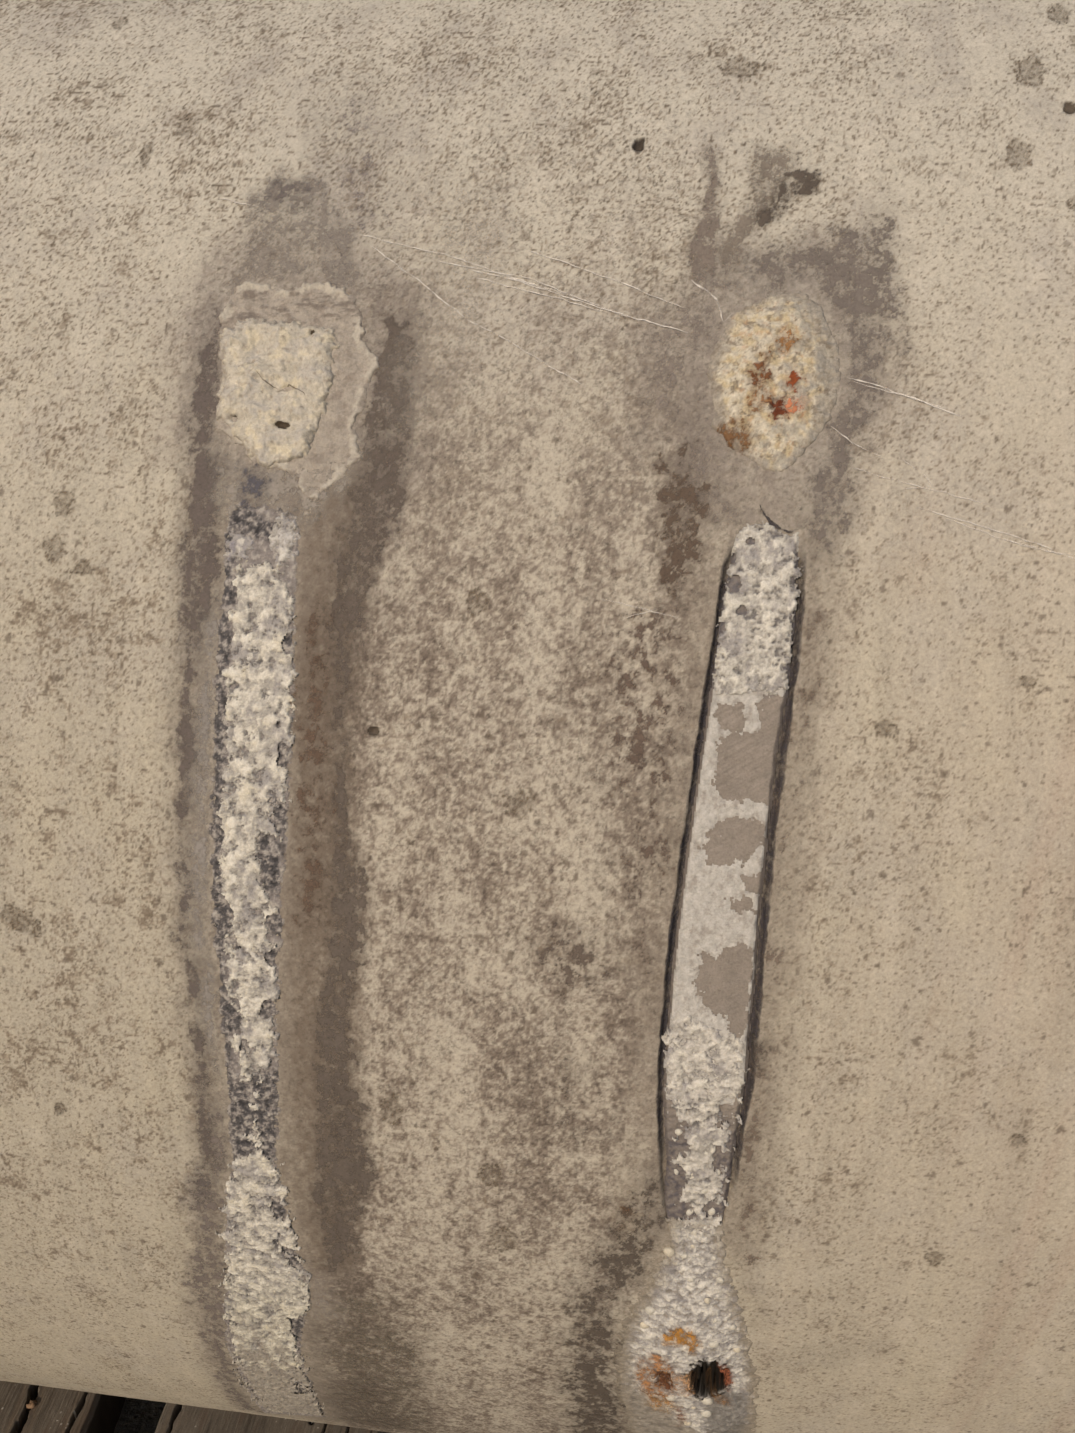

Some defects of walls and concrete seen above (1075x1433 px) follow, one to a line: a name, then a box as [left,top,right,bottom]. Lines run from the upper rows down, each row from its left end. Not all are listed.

rust [717,328,806,451]
leakage [689,146,911,559]
leakage [173,310,222,828]
leakage [593,418,737,899]
leakage [290,316,419,1272]
leakage [170,849,201,999]
leakage [180,1024,261,1412]
leakage [323,1295,426,1433]
leakage [561,1176,667,1433]
rust [636,1328,698,1420]
rust [714,1365,733,1404]
leakage [740,1099,763,1231]